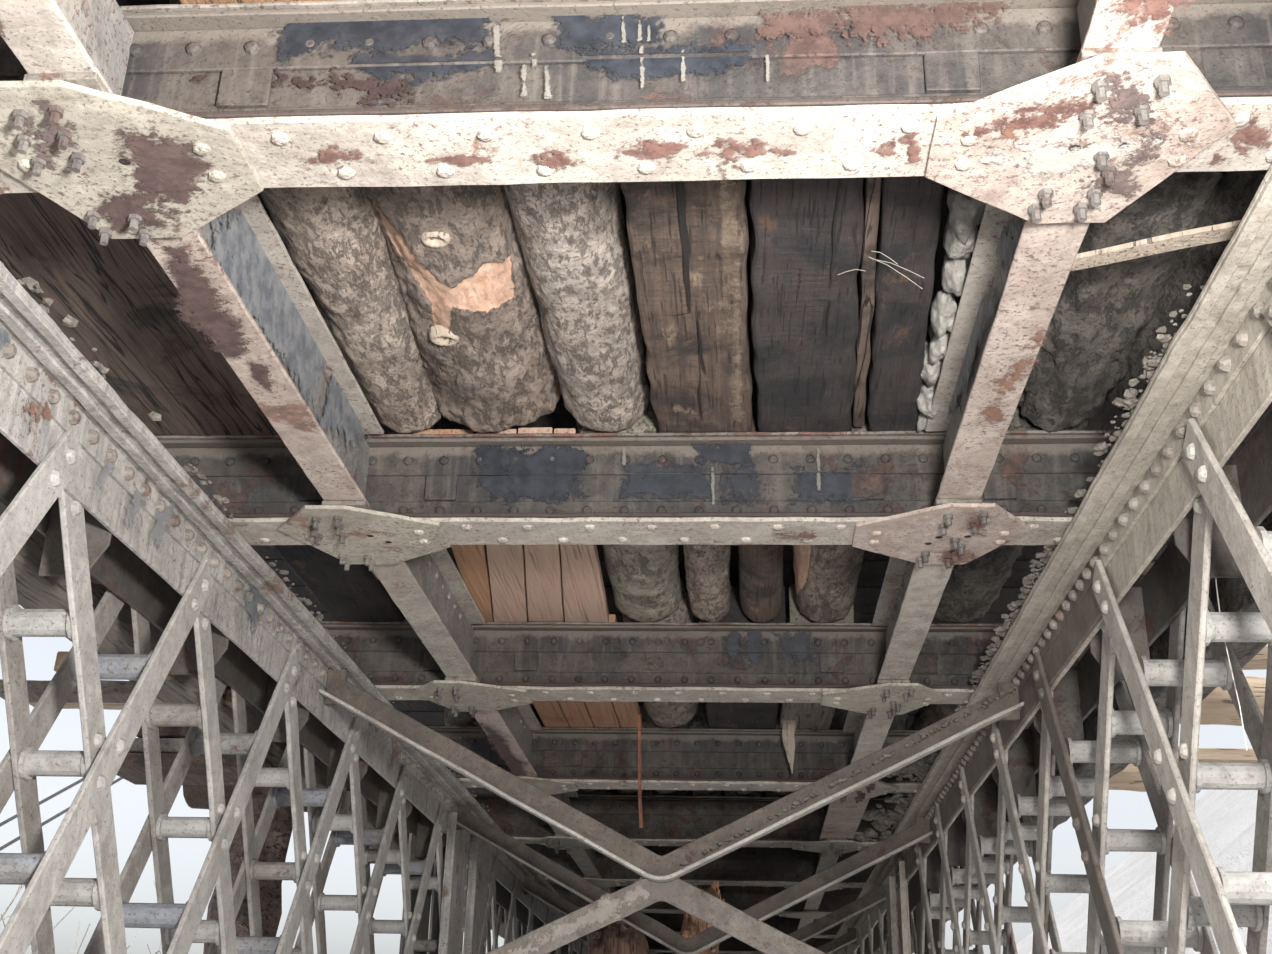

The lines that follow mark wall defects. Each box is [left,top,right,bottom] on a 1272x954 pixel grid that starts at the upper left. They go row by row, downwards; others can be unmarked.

rust [1104,0,1195,37]
peeling [551,14,762,82]
rust [12,100,79,174]
rust [419,153,496,167]
rust [530,147,585,171]
rust [615,132,797,180]
rust [961,67,1171,201]
rust [1207,116,1272,166]
rust [95,124,273,393]
peeling [472,444,590,505]
peeling [790,461,865,507]